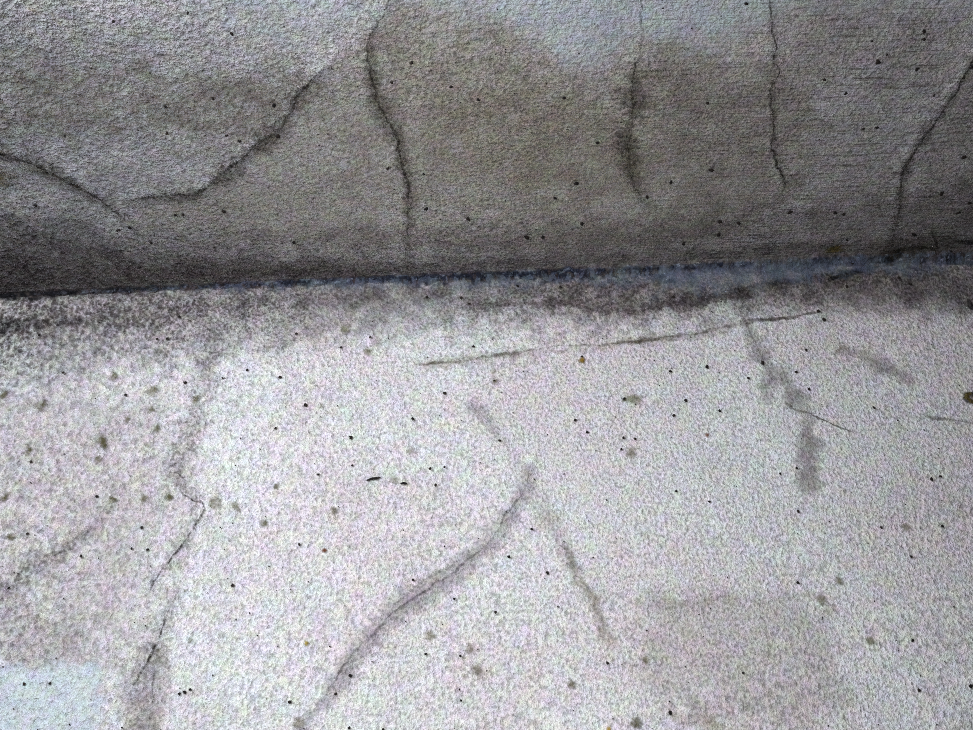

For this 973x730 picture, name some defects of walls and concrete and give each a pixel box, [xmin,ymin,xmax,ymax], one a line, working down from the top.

crack [0,154,118,215]
crack [142,68,325,201]
crack [366,19,410,231]
crack [617,61,646,186]
crack [769,1,785,184]
crack [899,61,973,210]
leakage [0,235,752,374]
leakage [761,239,973,321]